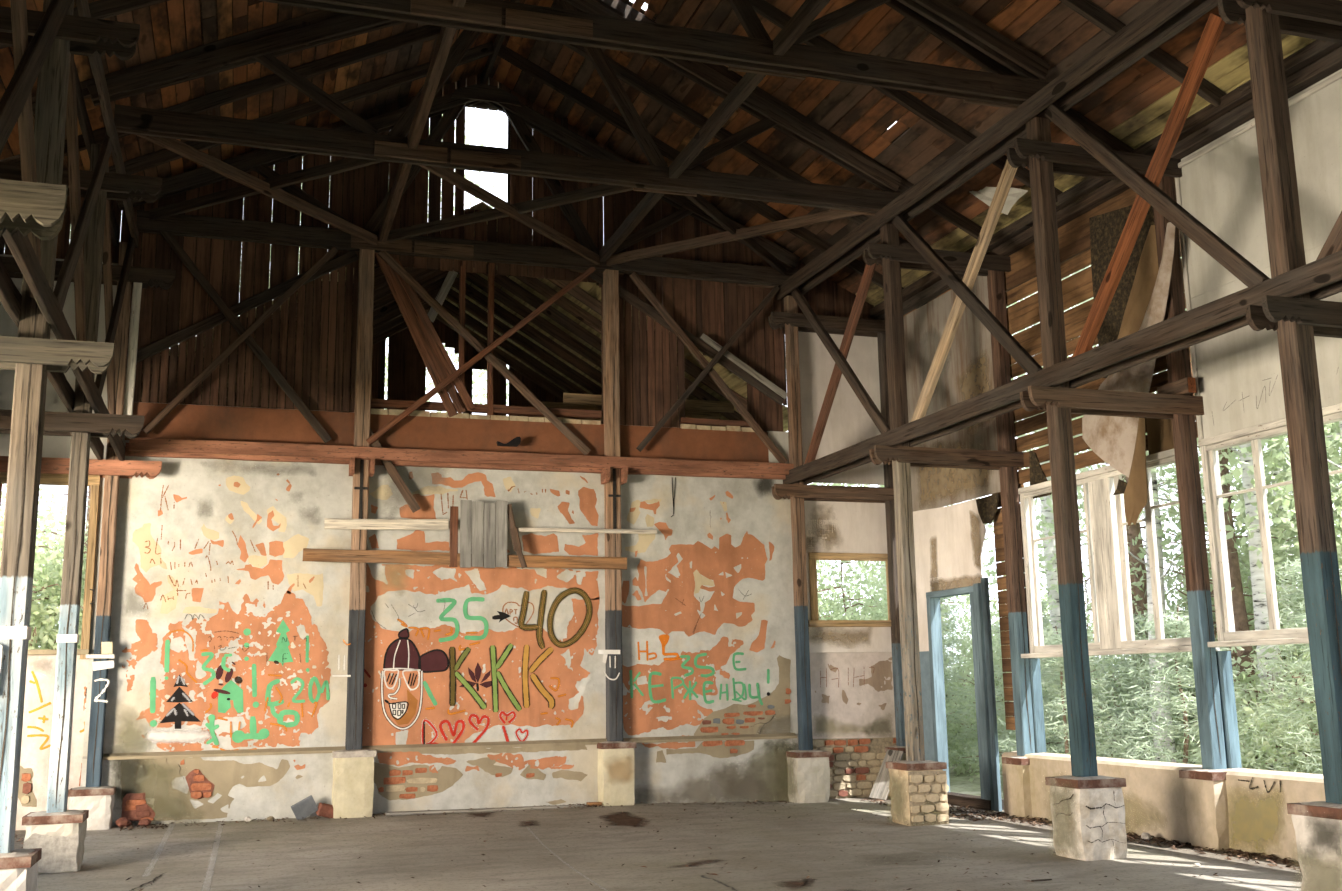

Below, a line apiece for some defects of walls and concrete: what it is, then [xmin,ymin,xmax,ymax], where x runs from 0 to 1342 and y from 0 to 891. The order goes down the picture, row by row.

peeling [121,473,331,822]
peeling [362,471,600,800]
peeling [622,491,791,763]
flaking render [813,738,896,799]